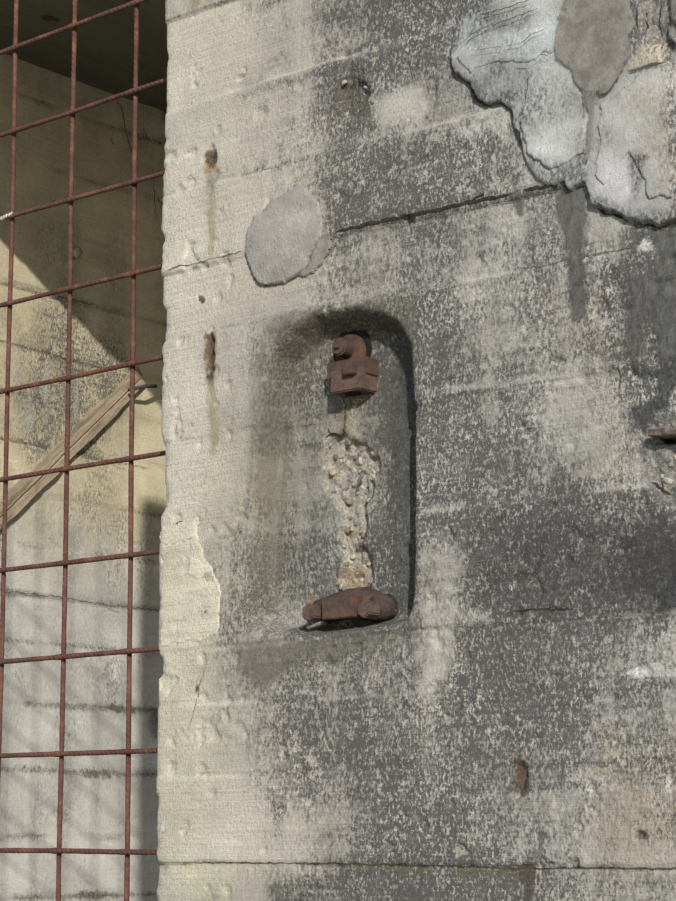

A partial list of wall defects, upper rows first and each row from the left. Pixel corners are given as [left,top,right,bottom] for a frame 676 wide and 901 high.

flaking render [450,0,676,228]
leakage [554,0,667,160]
crack [331,182,676,278]
leakage [509,191,523,215]
rust [205,332,217,444]
spalling [320,433,381,590]
crack [163,861,676,870]